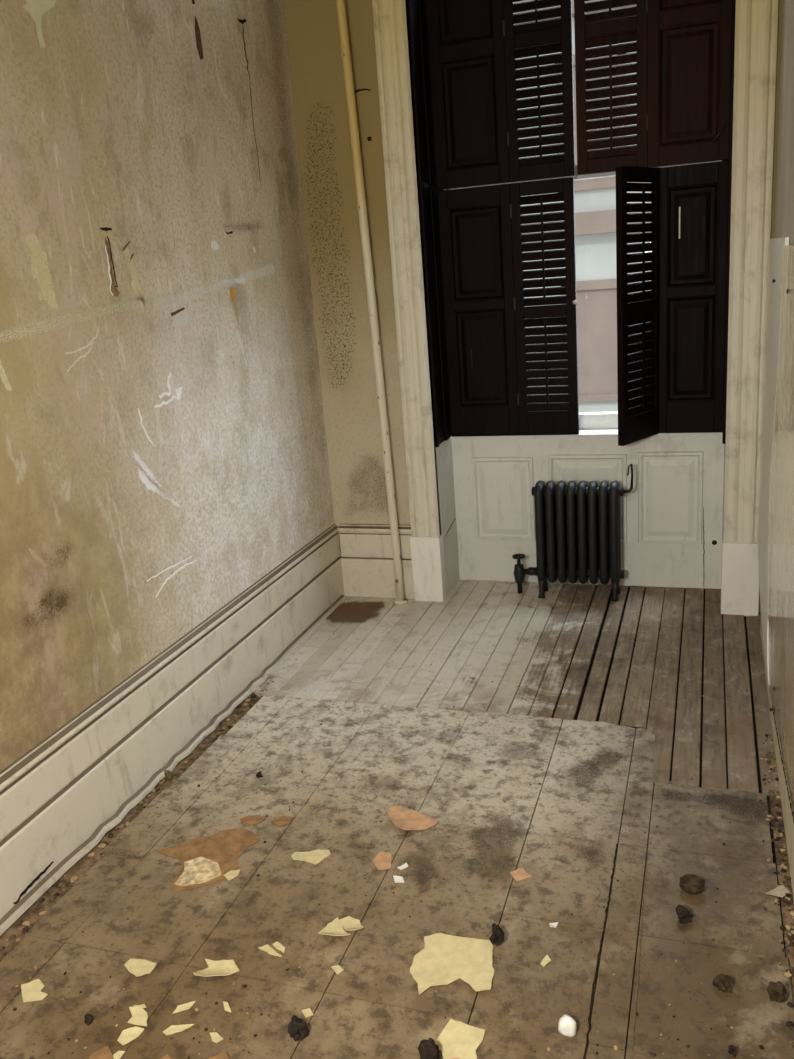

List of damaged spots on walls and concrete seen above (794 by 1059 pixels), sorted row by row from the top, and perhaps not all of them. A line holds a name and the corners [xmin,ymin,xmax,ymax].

damp [264,0,358,441]
damp [17,583,77,635]